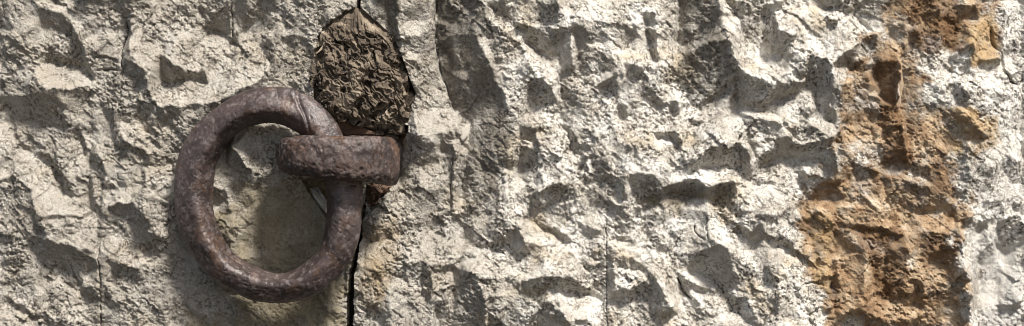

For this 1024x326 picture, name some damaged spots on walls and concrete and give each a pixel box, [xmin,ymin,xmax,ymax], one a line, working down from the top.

crack [349,236,363,326]